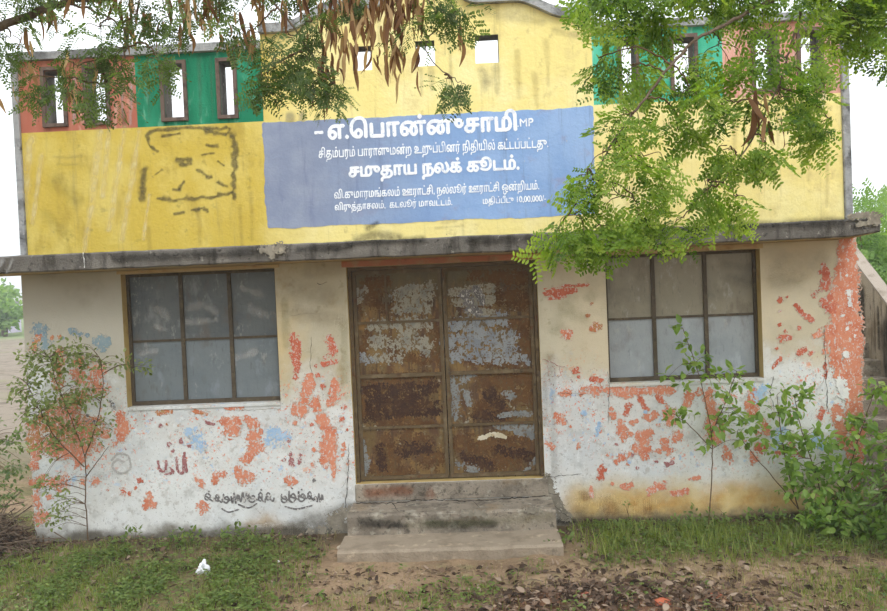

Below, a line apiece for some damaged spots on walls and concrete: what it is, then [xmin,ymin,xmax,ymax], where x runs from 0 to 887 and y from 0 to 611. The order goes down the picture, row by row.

peeling [22,321,158,527]
peeling [150,332,349,516]
spalling [305,503,352,535]
corrosion [357,268,537,477]
peeling [542,283,590,301]
peeling [558,366,733,498]
peeling [743,383,803,466]
peeling [772,211,884,488]